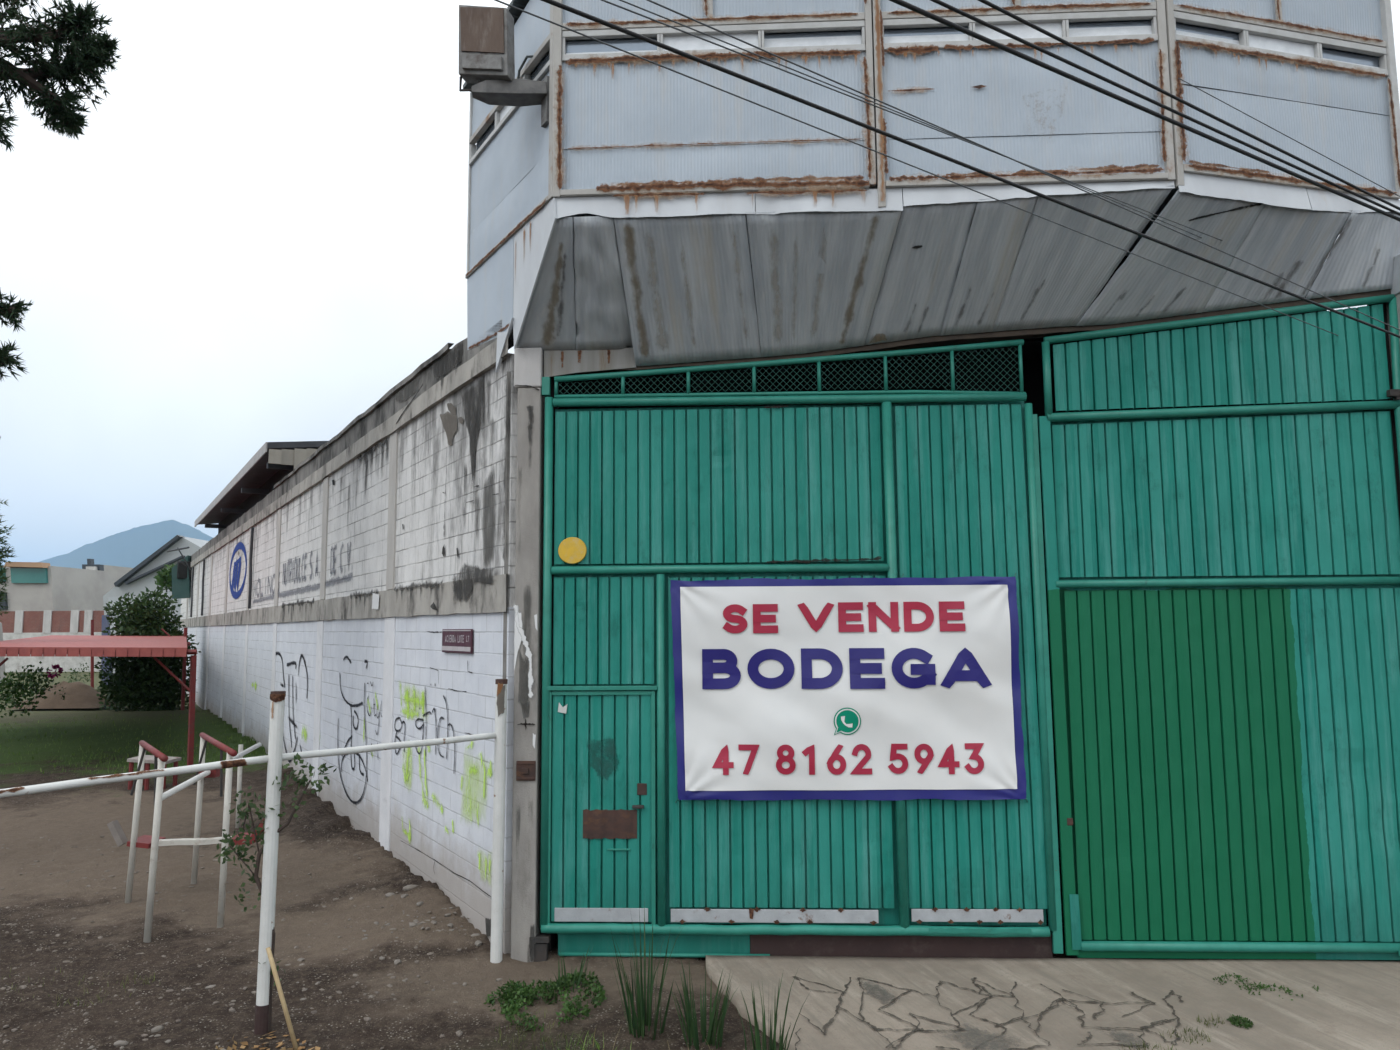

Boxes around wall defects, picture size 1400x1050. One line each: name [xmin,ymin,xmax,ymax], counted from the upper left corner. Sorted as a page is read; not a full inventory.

corrosion [556,0,1400,213]
corrosion [466,200,545,277]
damp [365,441,388,488]
damp [463,383,493,528]
crack [793,976,1183,1050]